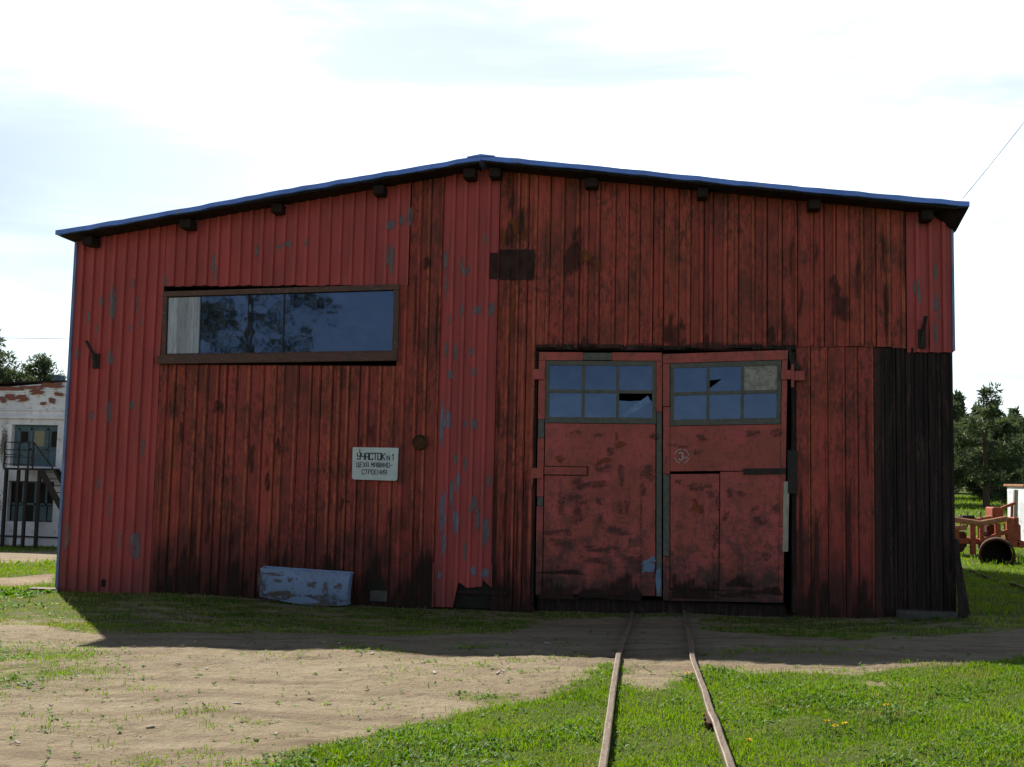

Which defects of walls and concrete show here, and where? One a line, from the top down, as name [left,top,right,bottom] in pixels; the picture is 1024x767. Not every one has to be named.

flaking render [0,382,65,405]
peeling [439,402,478,445]
peeling [439,454,490,577]
peeling [542,447,661,594]